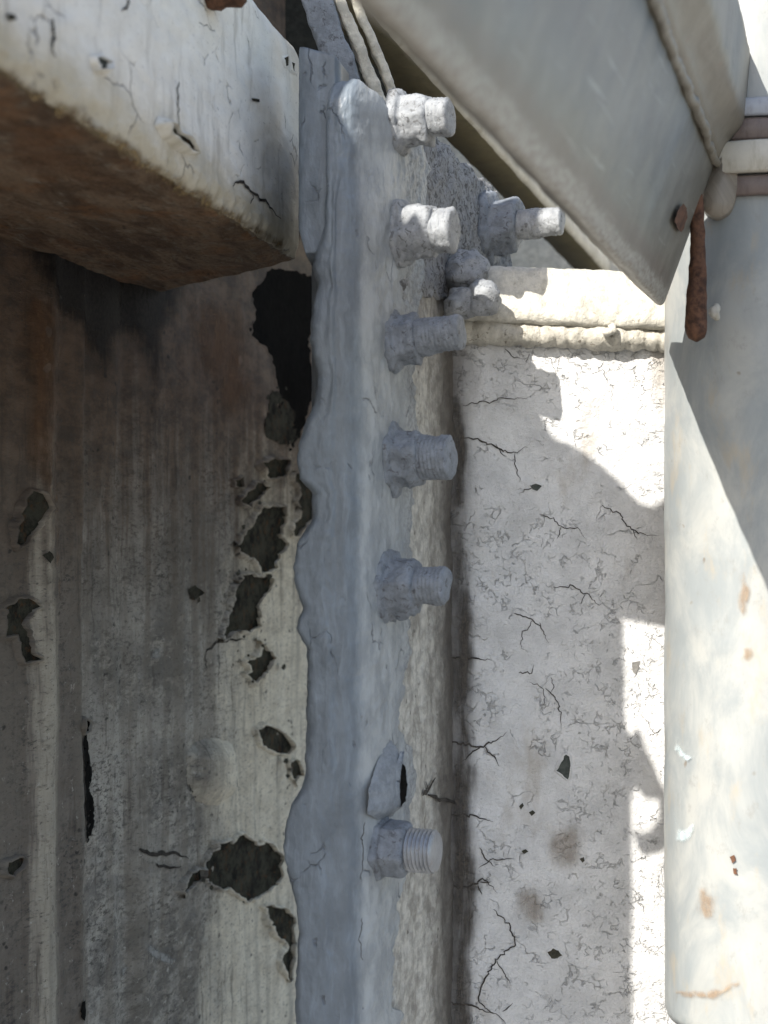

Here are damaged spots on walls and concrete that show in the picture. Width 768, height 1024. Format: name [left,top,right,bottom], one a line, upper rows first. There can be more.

crack [233,180,300,236]
peeling [216,266,312,688]
crack [466,437,534,493]
peeling [8,488,56,552]
peeling [0,595,47,666]
crack [514,613,562,722]
crack [83,735,95,843]
peeling [251,721,305,787]
crack [423,778,493,822]
crack [452,734,505,766]
peeling [173,831,298,982]
crack [451,848,516,1022]